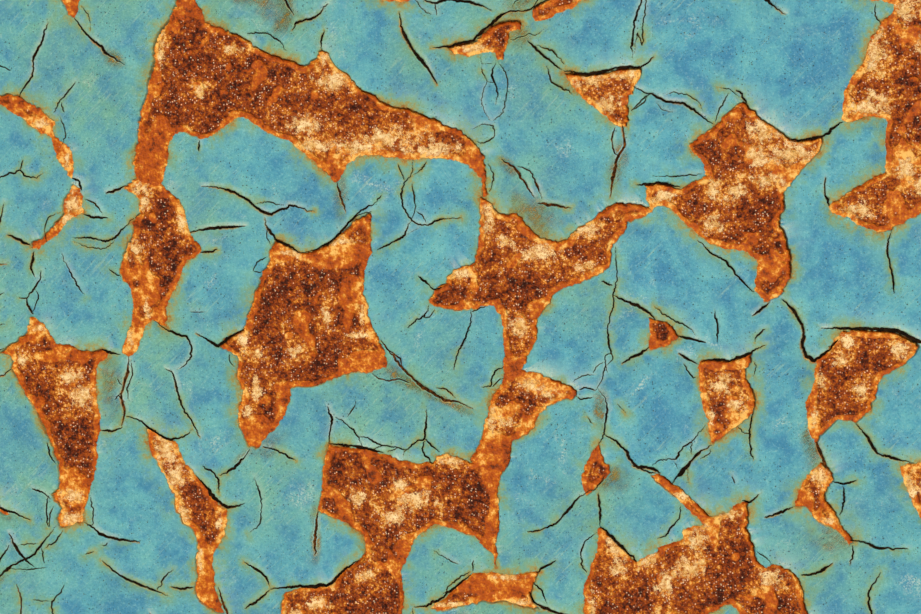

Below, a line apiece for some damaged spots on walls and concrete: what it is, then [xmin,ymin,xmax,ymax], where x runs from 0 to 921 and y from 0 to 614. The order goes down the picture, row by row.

peeling [0,94,84,249]
crack [190,161,460,273]
crack [399,0,547,84]
crack [510,0,747,197]
peeling [829,0,921,232]
peeling [2,317,108,527]
crack [102,312,244,441]
crack [327,341,473,464]
peeling [120,0,822,614]
crack [573,240,921,484]
peeling [805,330,918,443]
peeling [795,462,852,544]